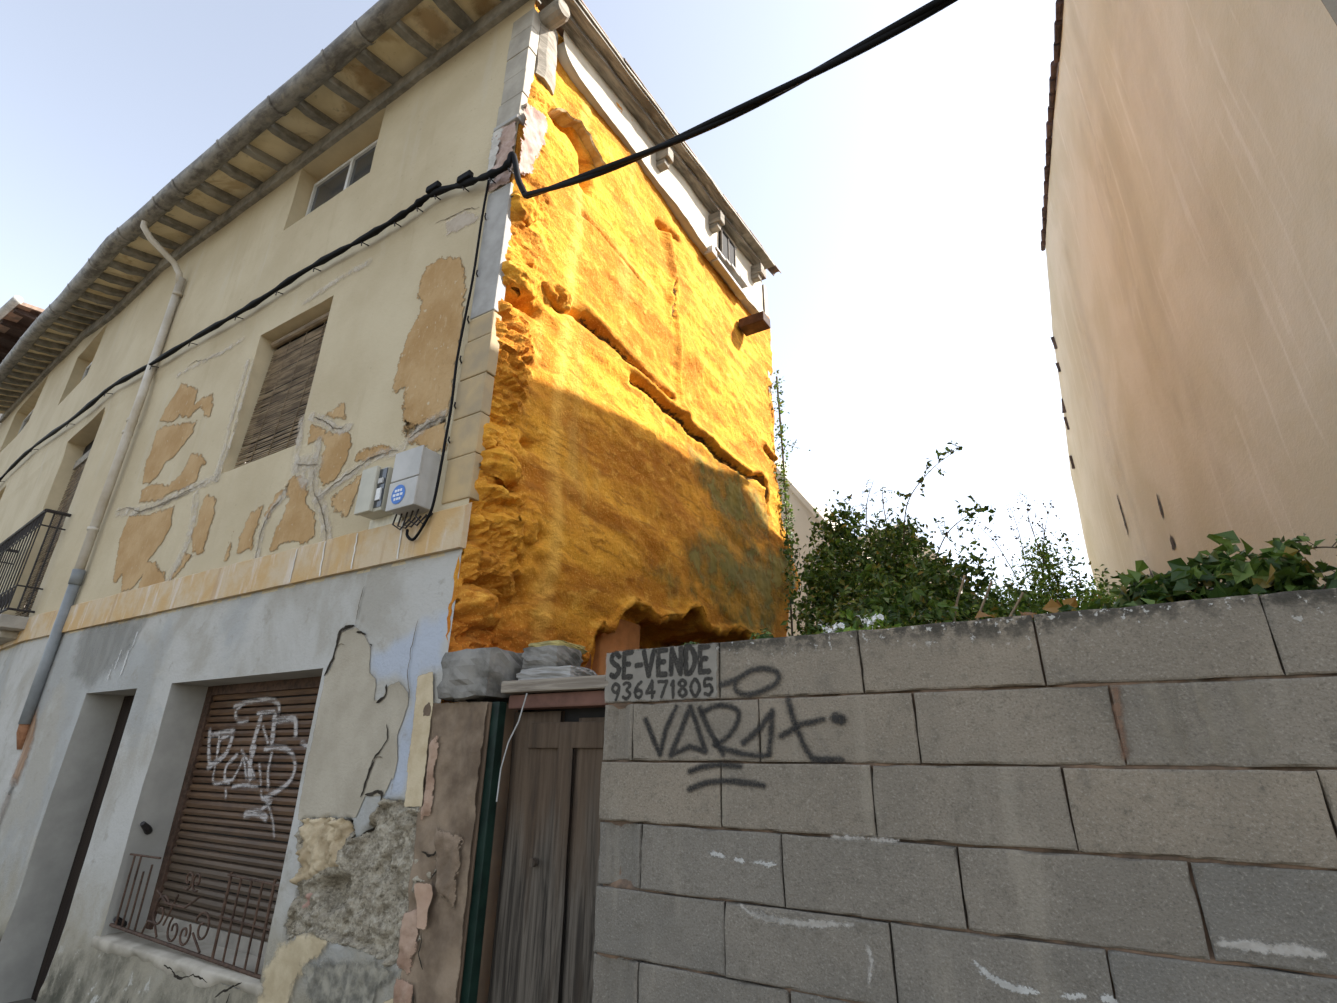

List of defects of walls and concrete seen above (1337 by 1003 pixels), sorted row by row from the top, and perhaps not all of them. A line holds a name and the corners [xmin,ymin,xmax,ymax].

flaking render [487,103,548,192]
peeling [392,256,467,452]
peeling [113,383,216,593]
peeling [223,403,392,561]
crack [324,590,372,676]
flaking render [258,628,464,1003]
crack [360,621,418,836]
spalling [580,596,757,675]